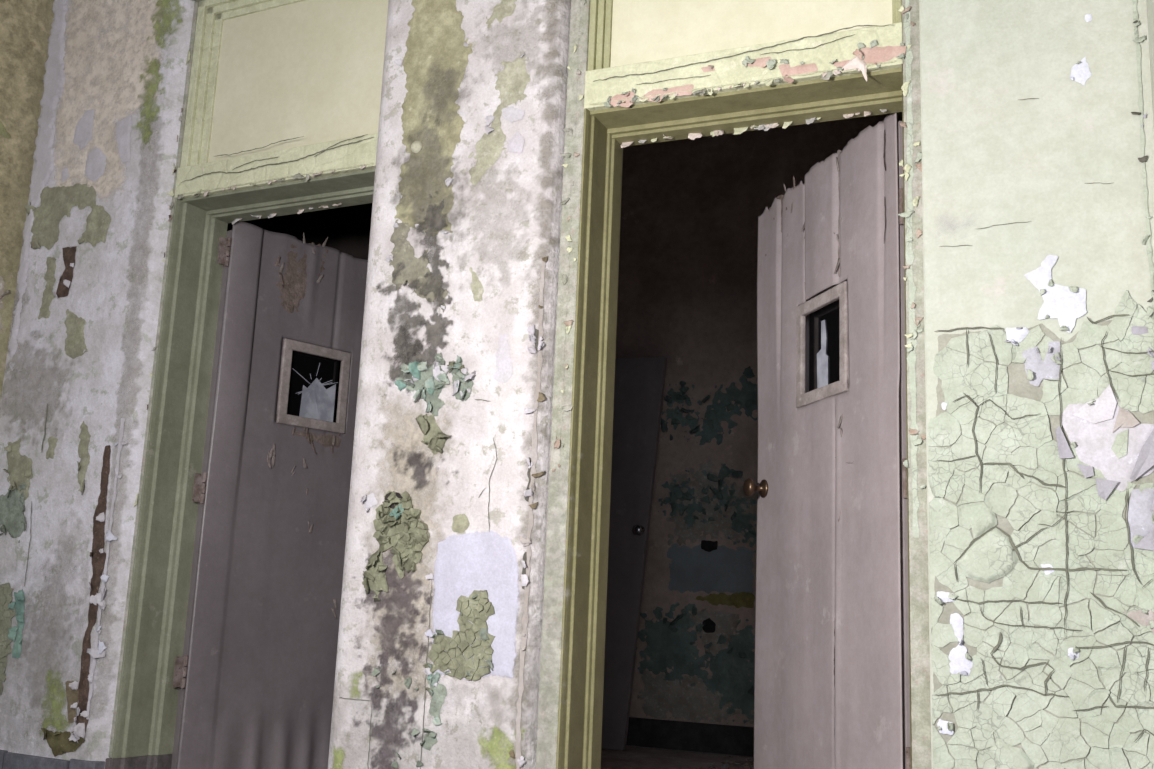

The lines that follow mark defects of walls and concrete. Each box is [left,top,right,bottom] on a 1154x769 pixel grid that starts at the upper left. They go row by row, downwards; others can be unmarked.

peeling [0,438,33,543]
peeling [0,0,111,371]
water stain [355,405,441,769]
water stain [376,130,455,386]
peeling [361,0,927,769]
crack [928,290,1154,769]
flaking render [1005,255,1087,386]
flaking render [1070,57,1091,86]
flaking render [1055,384,1154,551]
peeling [1131,0,1154,335]